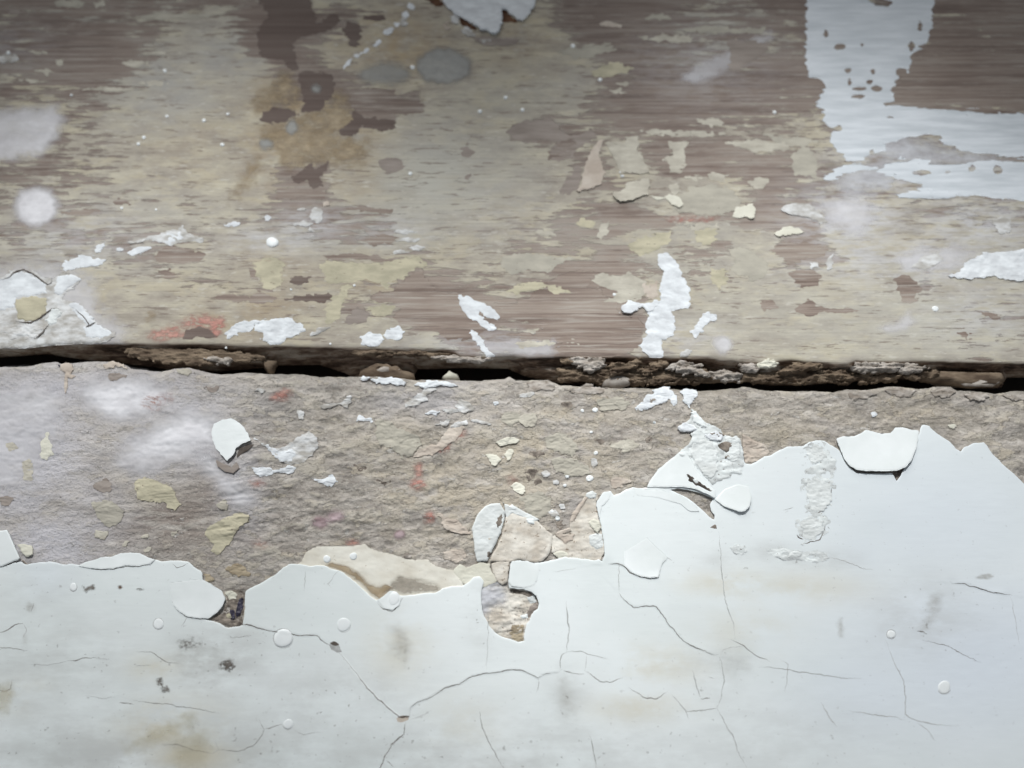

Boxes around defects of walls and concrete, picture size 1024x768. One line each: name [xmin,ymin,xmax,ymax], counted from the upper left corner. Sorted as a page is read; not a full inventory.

peeling [442,0,536,43]
peeling [257,0,386,125]
peeling [339,88,425,136]
peeling [275,161,329,200]
peeling [323,234,400,262]
peeling [769,203,859,317]
peeling [0,268,1024,768]
crack [785,489,872,570]
crack [3,604,111,666]
crack [227,540,848,768]
crack [861,647,957,738]
crack [951,583,1019,640]